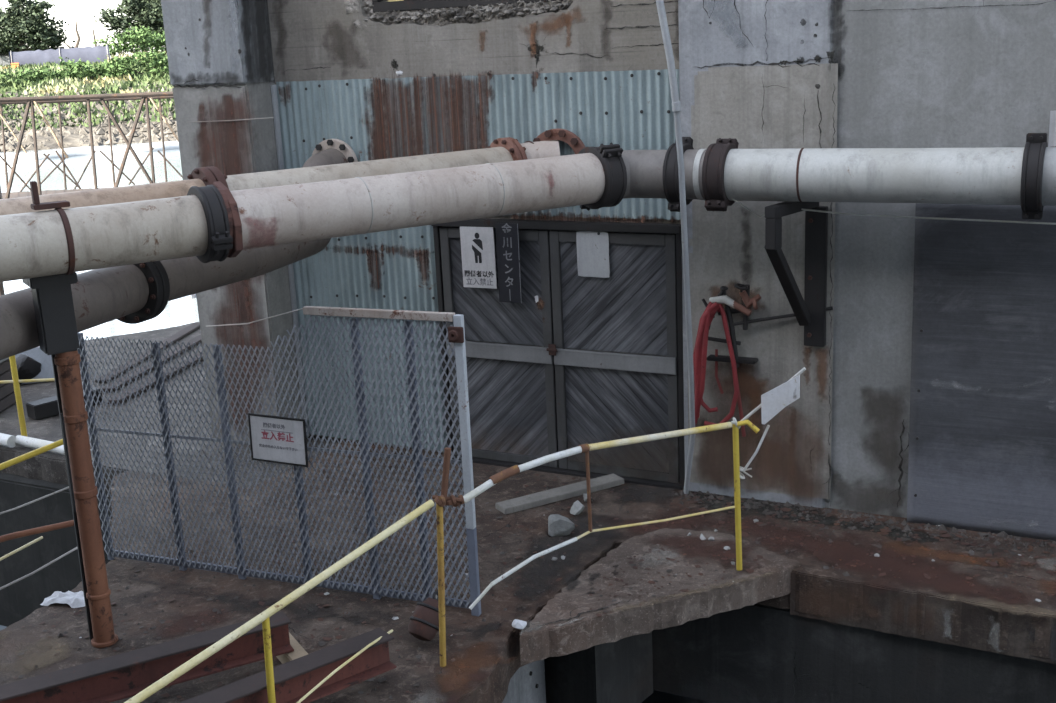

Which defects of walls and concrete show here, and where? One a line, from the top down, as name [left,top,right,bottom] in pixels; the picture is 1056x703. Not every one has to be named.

spalling [344,0,574,30]
corrosion [525,9,578,57]
crack [607,1,679,49]
crack [697,0,835,148]
leakage [830,0,844,75]
corrosion [198,95,251,176]
corrosion [362,71,493,160]
corrosion [216,276,269,432]
corrosion [723,365,821,493]
leakage [864,389,900,470]
corrosion [628,509,1026,604]
crack [524,600,630,631]